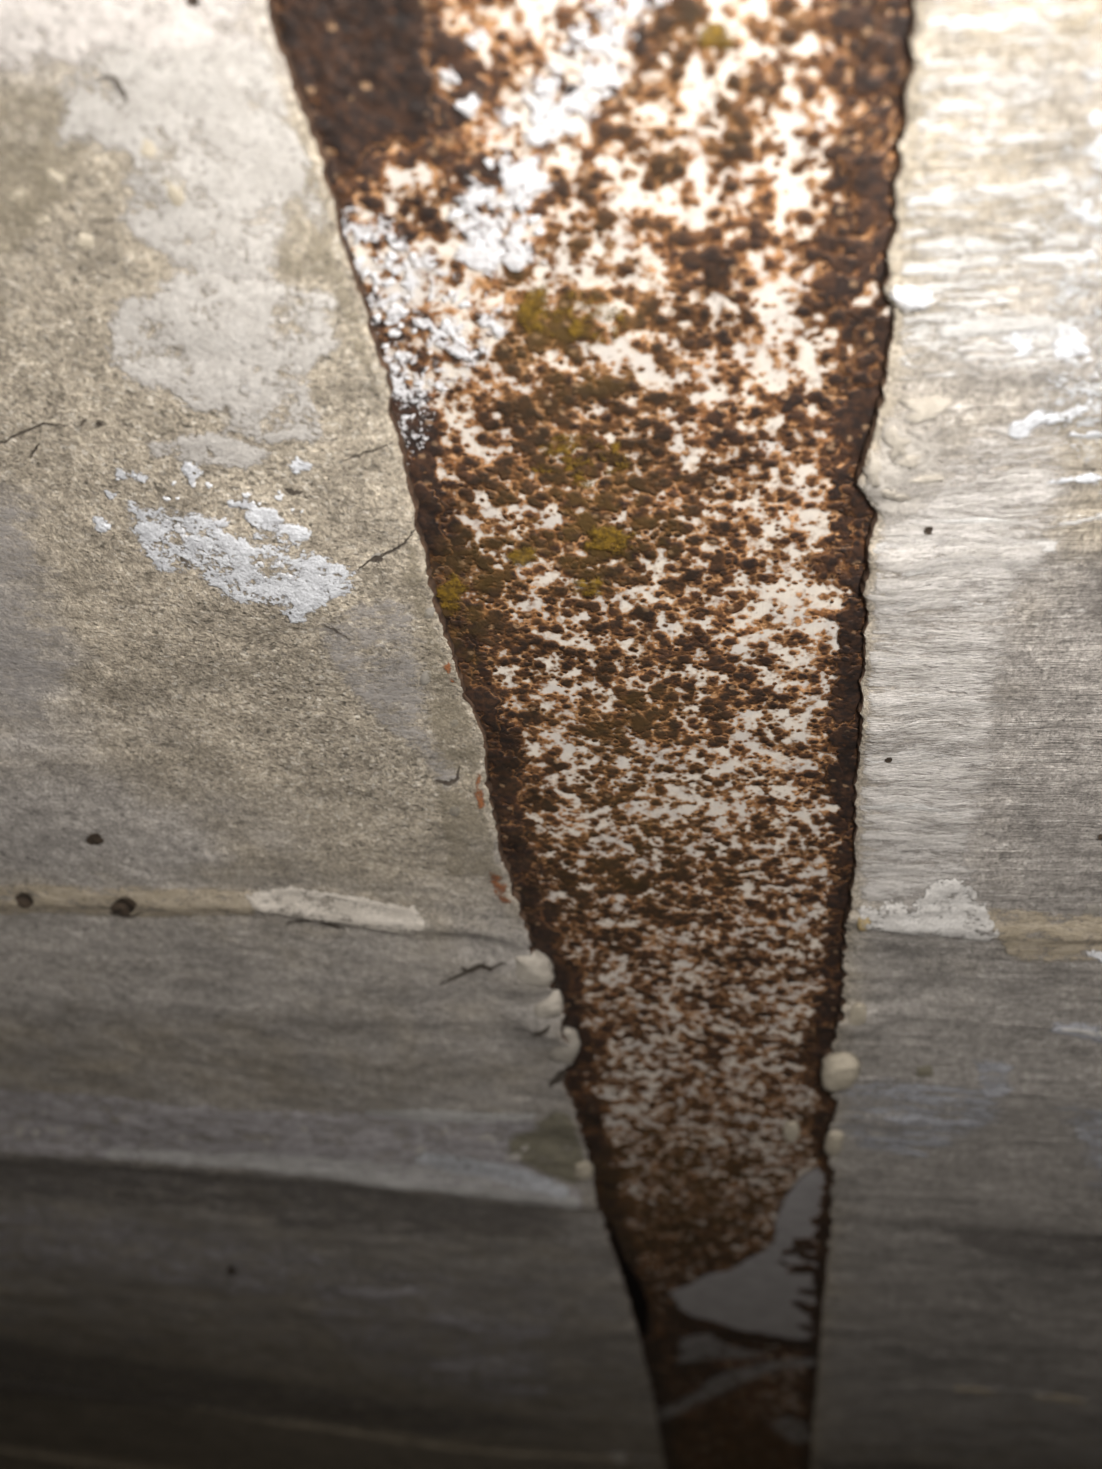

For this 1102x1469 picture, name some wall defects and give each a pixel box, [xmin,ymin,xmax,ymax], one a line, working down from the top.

damp [898,0,1100,379]
efflorescence [290,456,312,474]
efflorescence [92,516,111,533]
damp [914,516,1039,524]
damp [1059,513,1102,527]
efflorescence [105,461,356,623]
rust [272,0,912,1469]
efflorescence [859,879,1000,942]
crack [440,961,506,985]
crack [532,1025,550,1036]
crack [549,1070,567,1087]
crack [603,1213,649,1337]